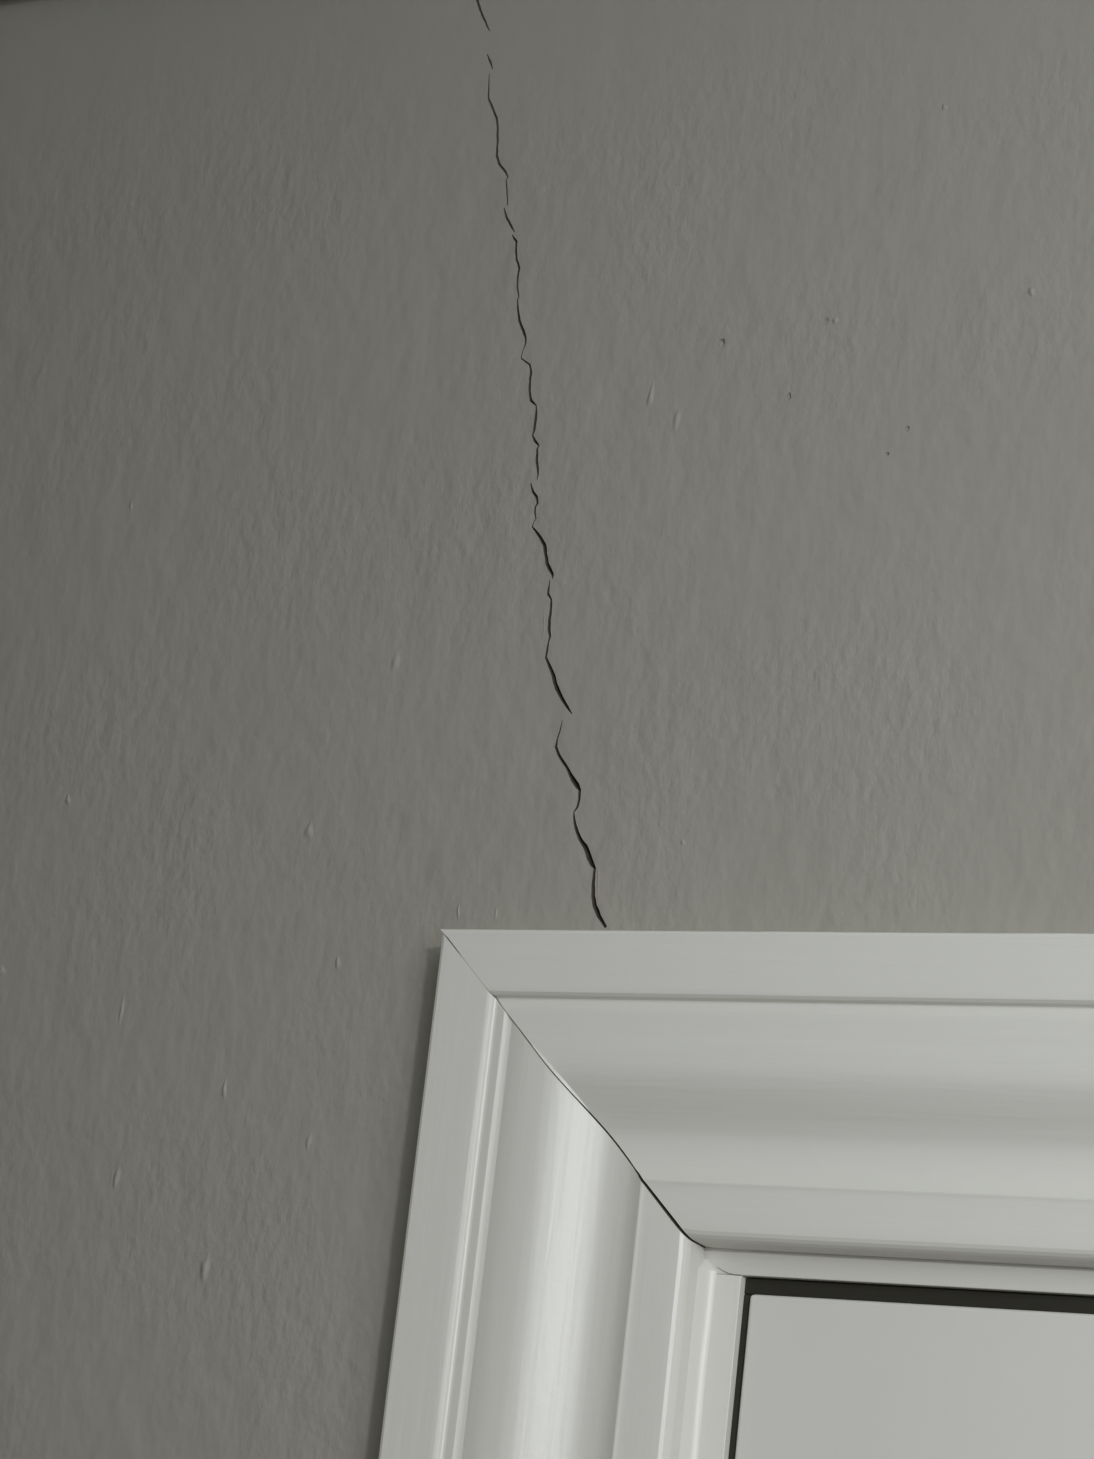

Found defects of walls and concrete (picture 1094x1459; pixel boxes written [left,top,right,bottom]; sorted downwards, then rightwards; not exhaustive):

crack [476,0,607,928]